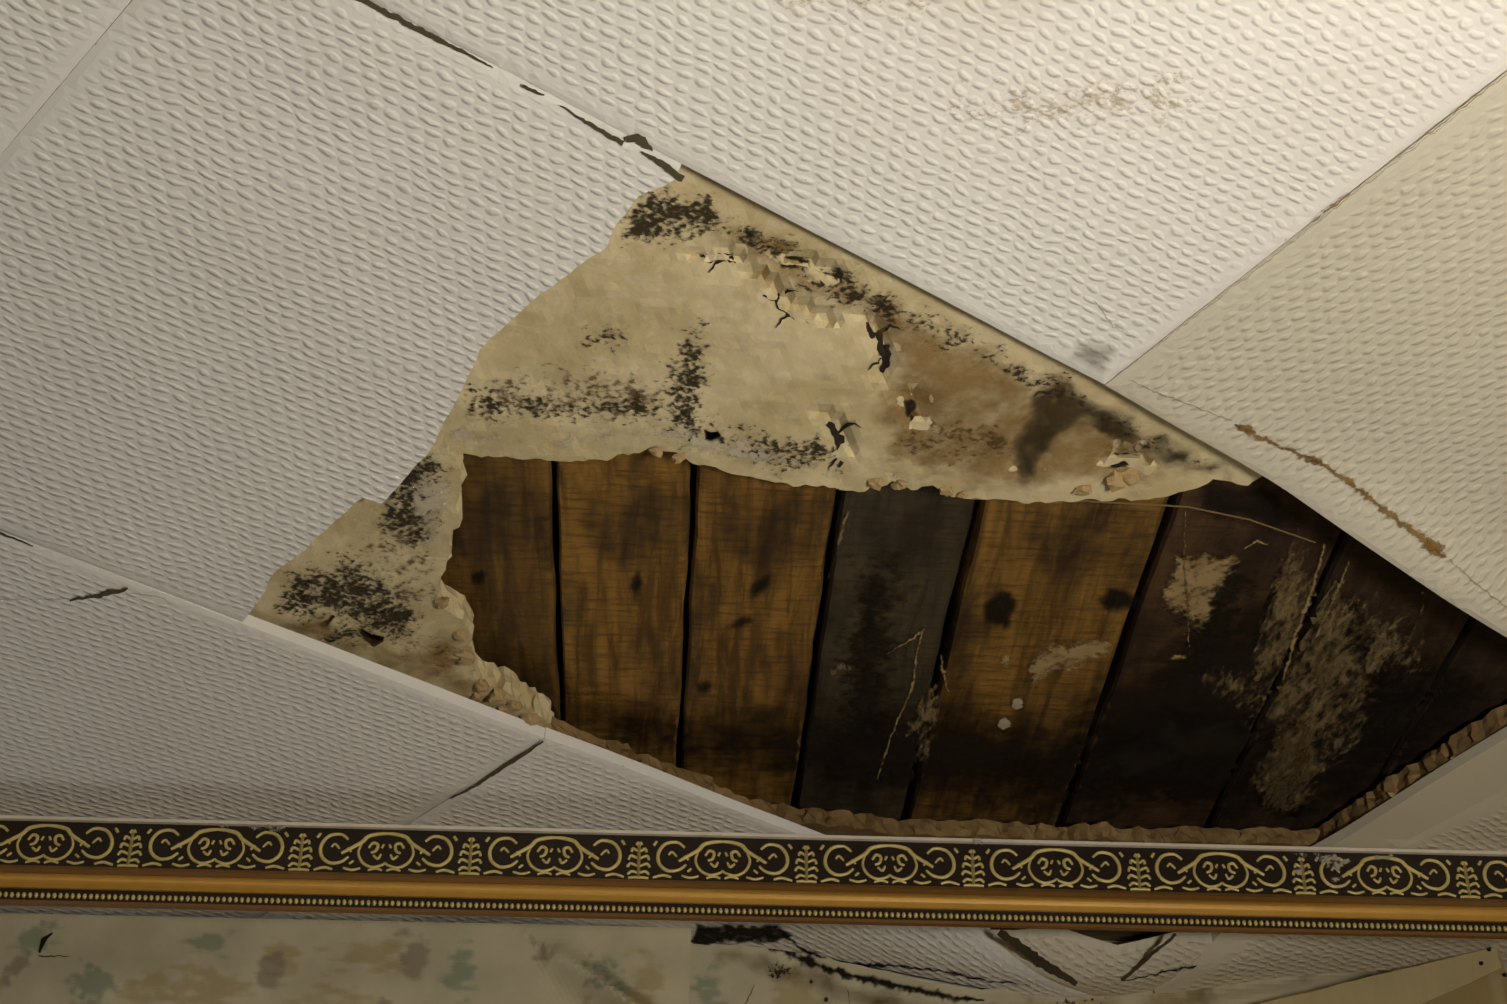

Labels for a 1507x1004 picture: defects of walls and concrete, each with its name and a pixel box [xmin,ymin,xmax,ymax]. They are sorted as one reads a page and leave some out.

water stain [465,318,843,475]
crack [700,253,736,273]
crack [763,289,808,328]
crack [866,322,900,373]
water stain [620,185,1285,525]
spalling [249,164,1507,882]
corrosion [1130,380,1506,607]
water stain [615,512,1484,815]
water stain [692,924,1027,1004]